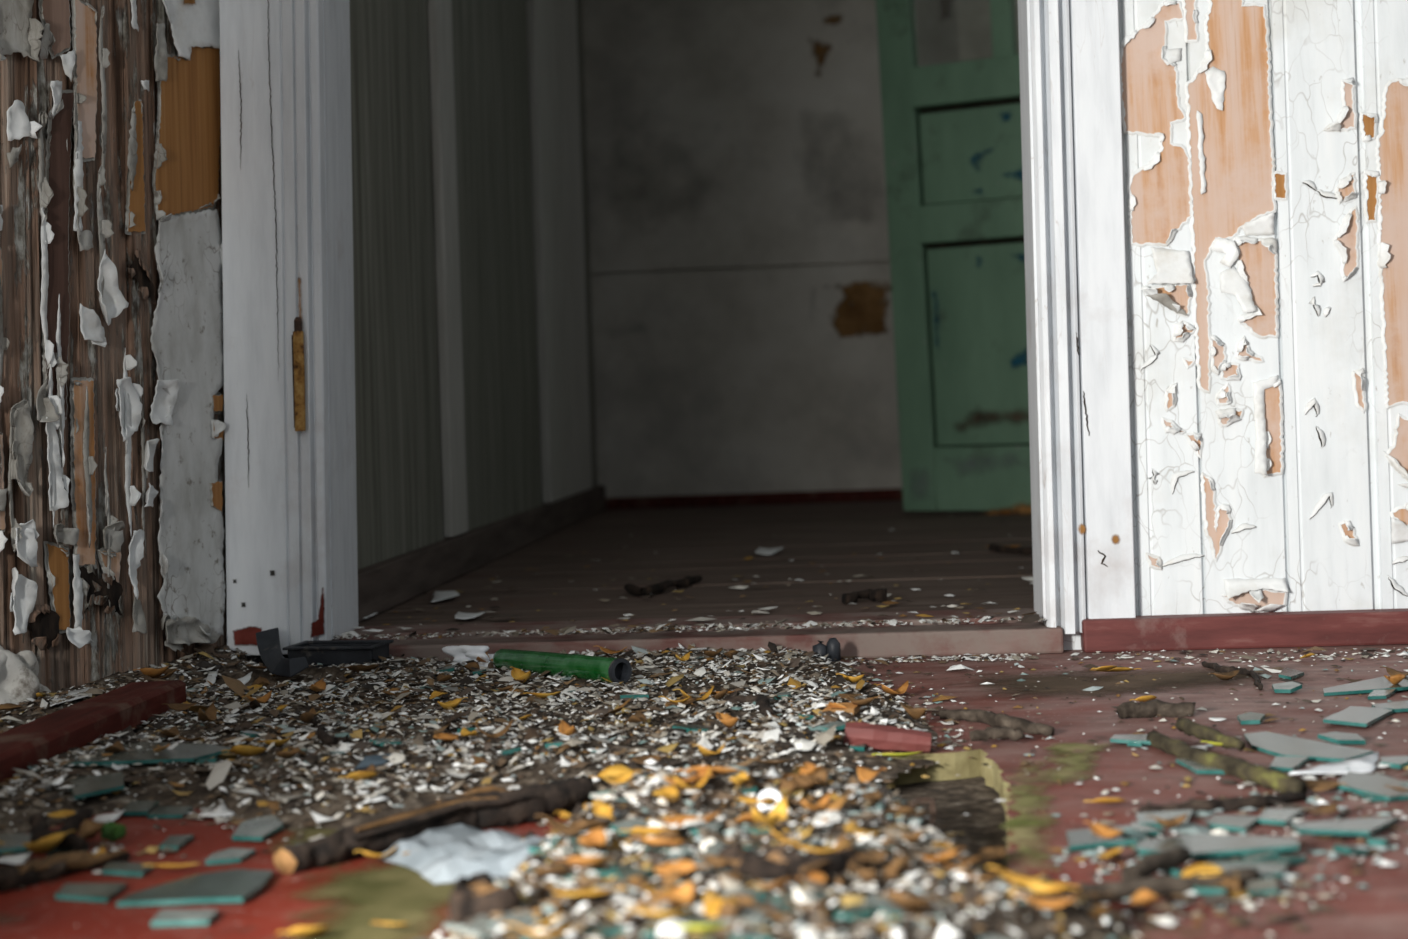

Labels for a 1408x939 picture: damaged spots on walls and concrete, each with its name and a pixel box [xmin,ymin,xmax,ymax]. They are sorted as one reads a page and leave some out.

peeling [809,38,831,77]
peeling [0,0,226,652]
peeling [826,281,892,337]
peeling [1120,0,1289,478]
peeling [1323,76,1408,546]
peeling [1146,552,1163,570]
peeling [1161,382,1233,563]
peeling [1221,577,1289,613]